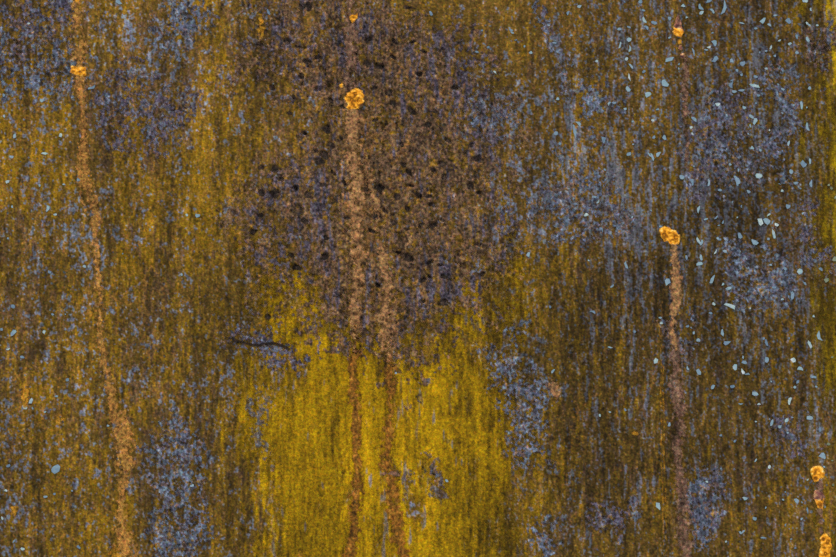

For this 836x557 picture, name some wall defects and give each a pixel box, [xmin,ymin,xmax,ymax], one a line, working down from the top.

rust [0,0,642,557]
rust [656,226,732,557]
rust [768,407,809,459]
rust [811,448,832,557]